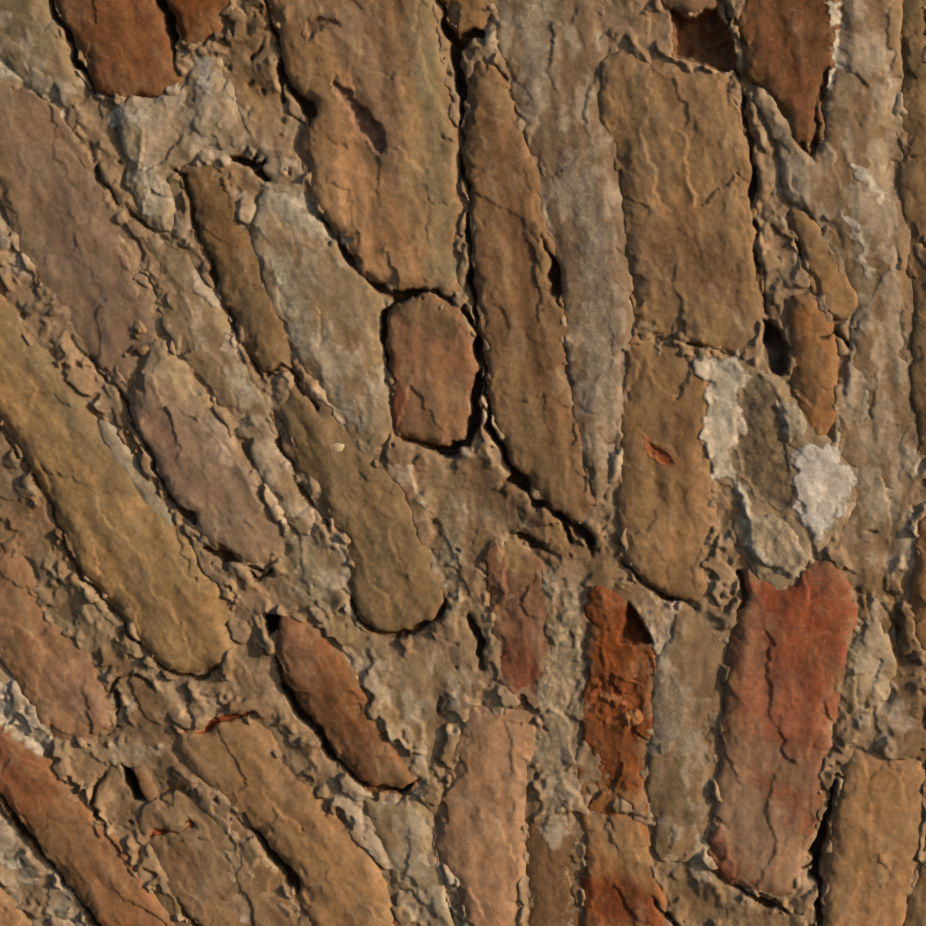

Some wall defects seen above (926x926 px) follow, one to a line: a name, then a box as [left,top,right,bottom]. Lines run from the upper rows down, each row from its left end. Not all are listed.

water stain [692,349,774,566]
water stain [791,443,857,543]